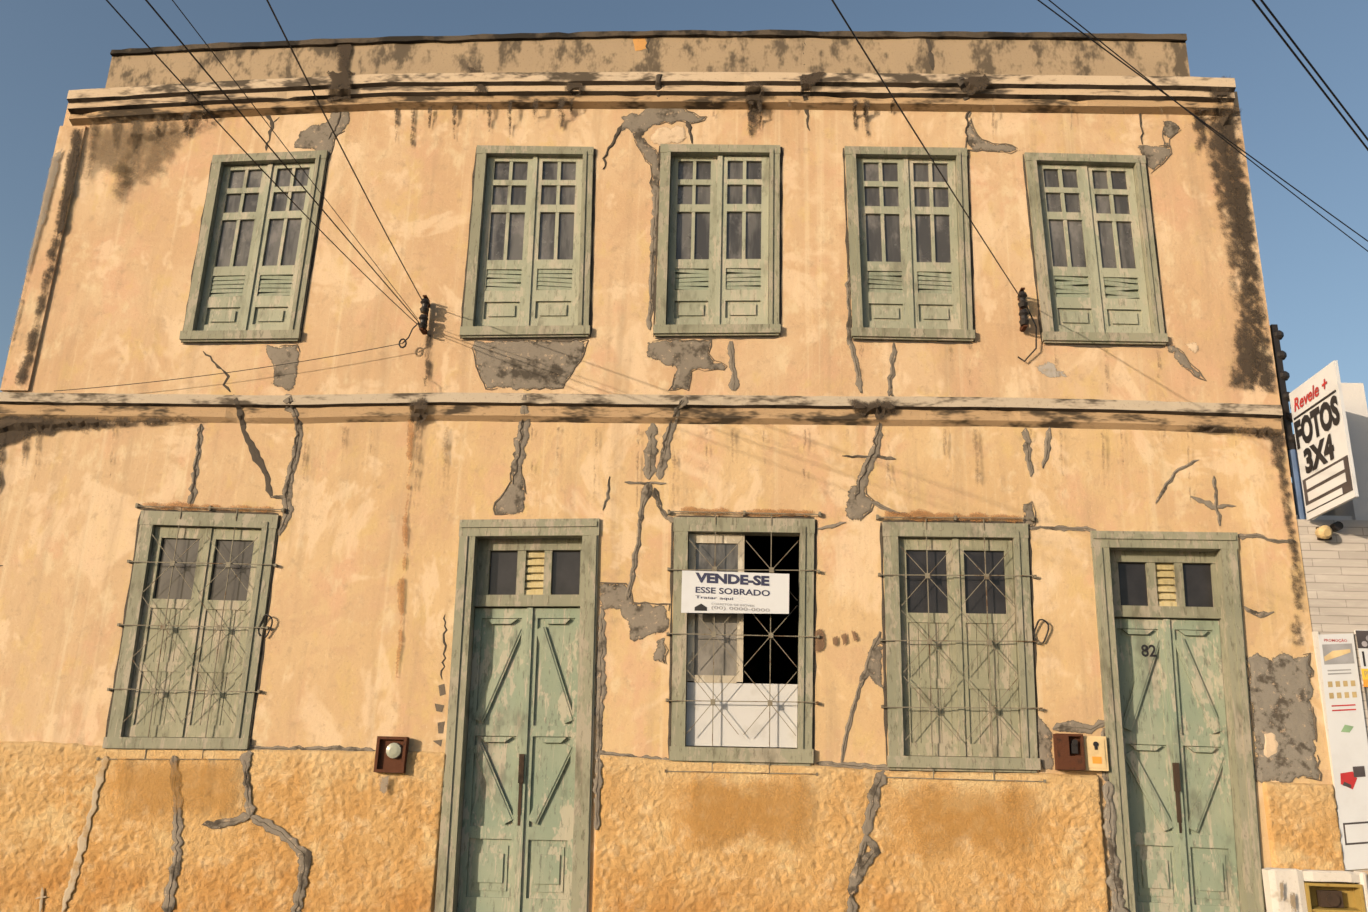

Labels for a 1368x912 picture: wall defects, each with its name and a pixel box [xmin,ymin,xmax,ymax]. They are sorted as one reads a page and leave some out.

damp [2,78,209,383]
damp [745,81,764,135]
damp [853,100,870,135]
flaking render [1138,113,1186,171]
damp [1192,77,1275,392]
flaking render [471,338,588,515]
flaking render [600,74,740,611]
crack [817,267,905,530]
crack [1155,460,1292,543]
crack [161,736,375,912]
crack [816,631,890,912]
flaking render [1246,653,1322,783]